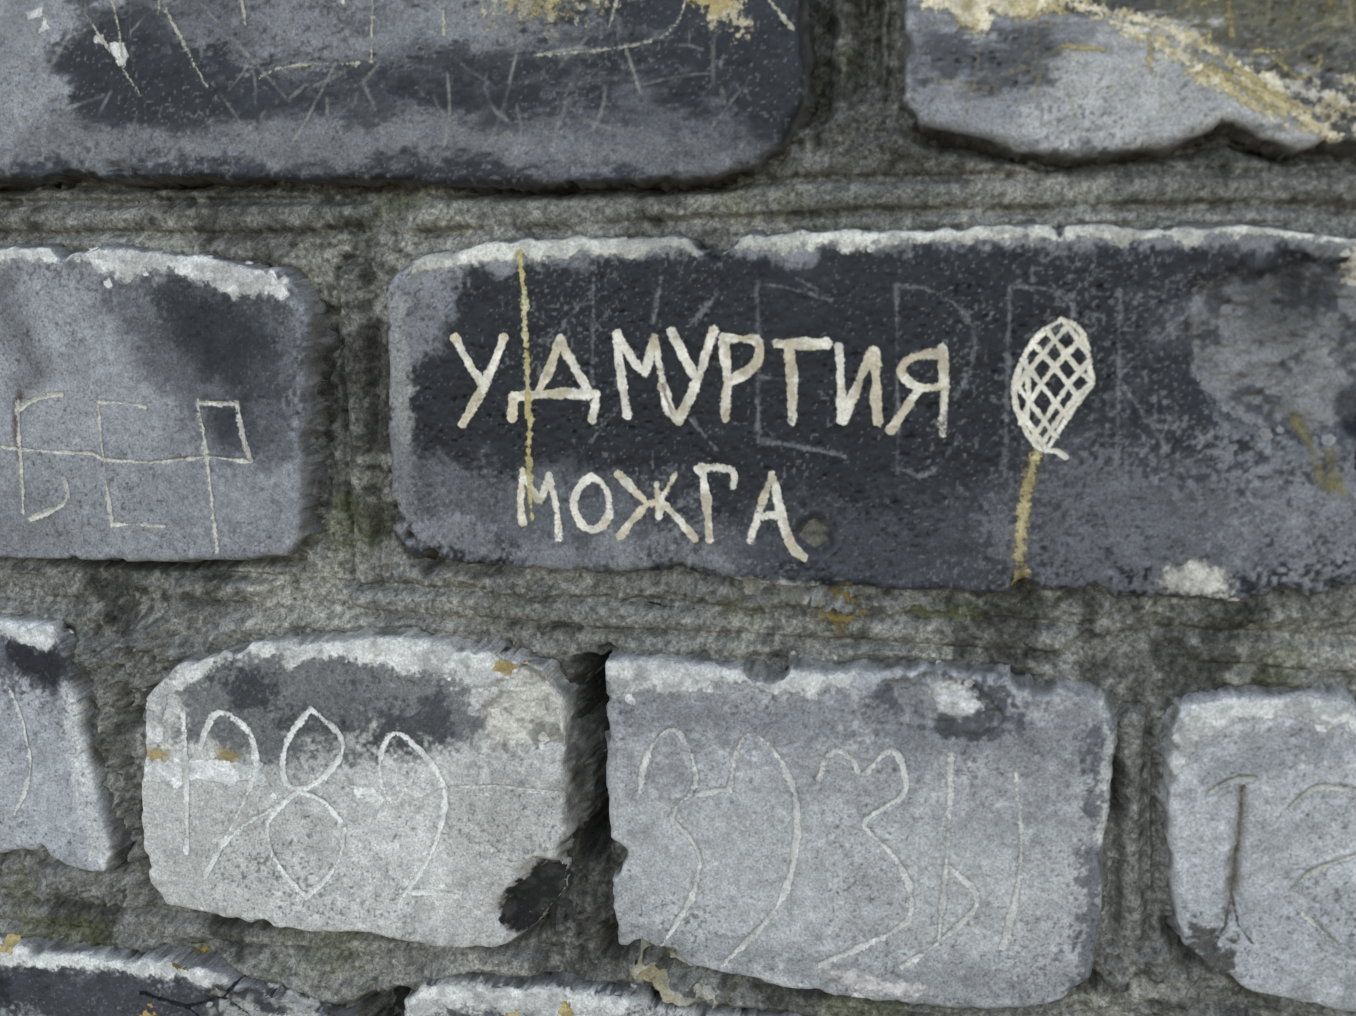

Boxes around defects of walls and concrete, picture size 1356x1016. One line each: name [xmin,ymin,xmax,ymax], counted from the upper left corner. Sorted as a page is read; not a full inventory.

peeling [479,0,629,43]
peeling [687,0,753,39]
peeling [920,0,1356,143]
crack [139,975,249,1016]